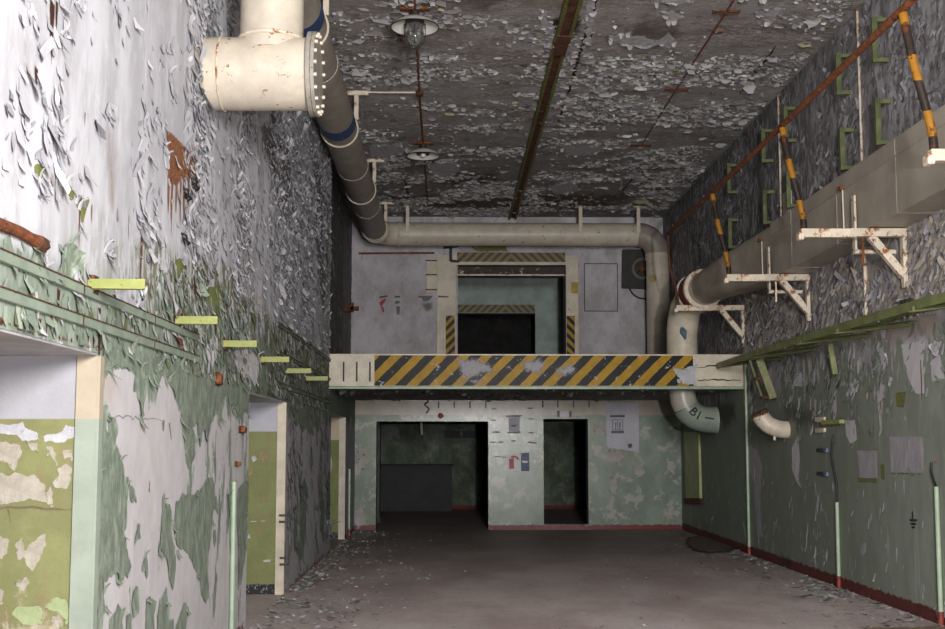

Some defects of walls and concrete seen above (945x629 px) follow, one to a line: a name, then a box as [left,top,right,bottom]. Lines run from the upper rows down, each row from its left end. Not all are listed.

corrosion [167,131,201,232]
peeling [0,0,727,629]
peeling [327,0,945,305]
peeling [697,209,945,568]